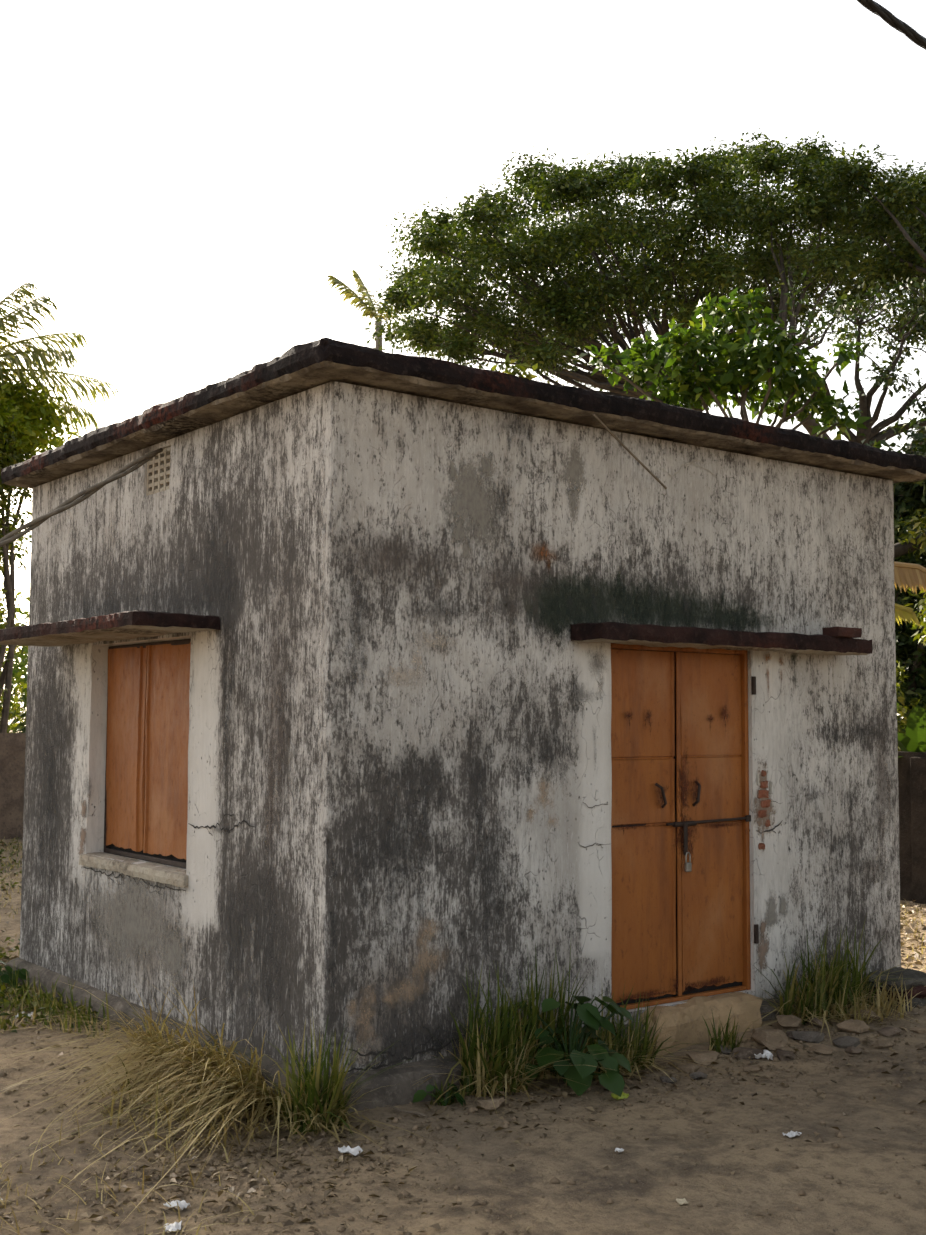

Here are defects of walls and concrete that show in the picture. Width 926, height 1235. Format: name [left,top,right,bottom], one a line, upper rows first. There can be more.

leakage [559,446,585,521]
crack [579,802,608,848]
spalling [754,762,780,851]